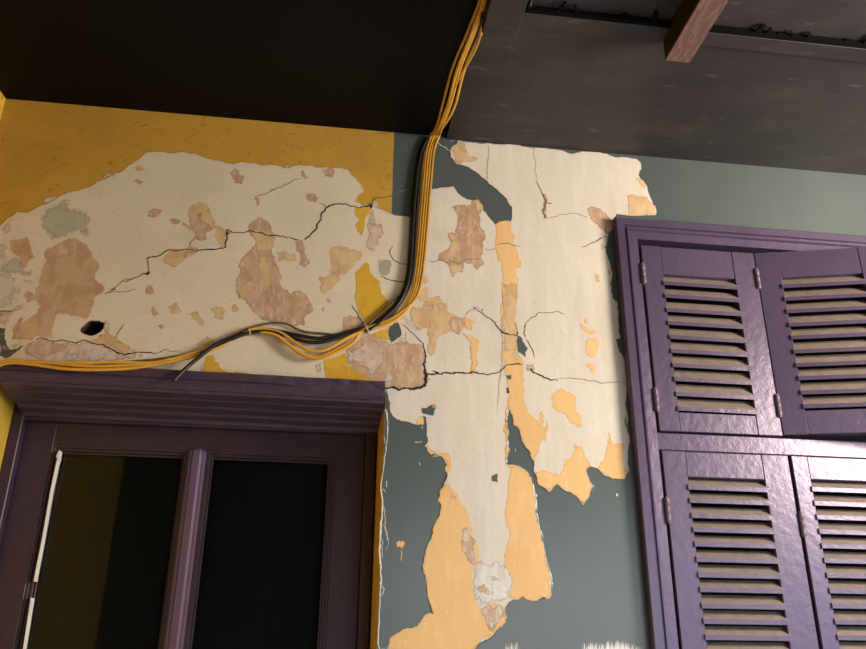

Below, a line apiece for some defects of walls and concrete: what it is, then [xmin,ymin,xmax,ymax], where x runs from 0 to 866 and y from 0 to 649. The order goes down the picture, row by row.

crack [536,181,586,219]
crack [104,194,394,294]
crack [0,324,179,358]
crack [385,307,626,391]
peeling [0,140,657,649]